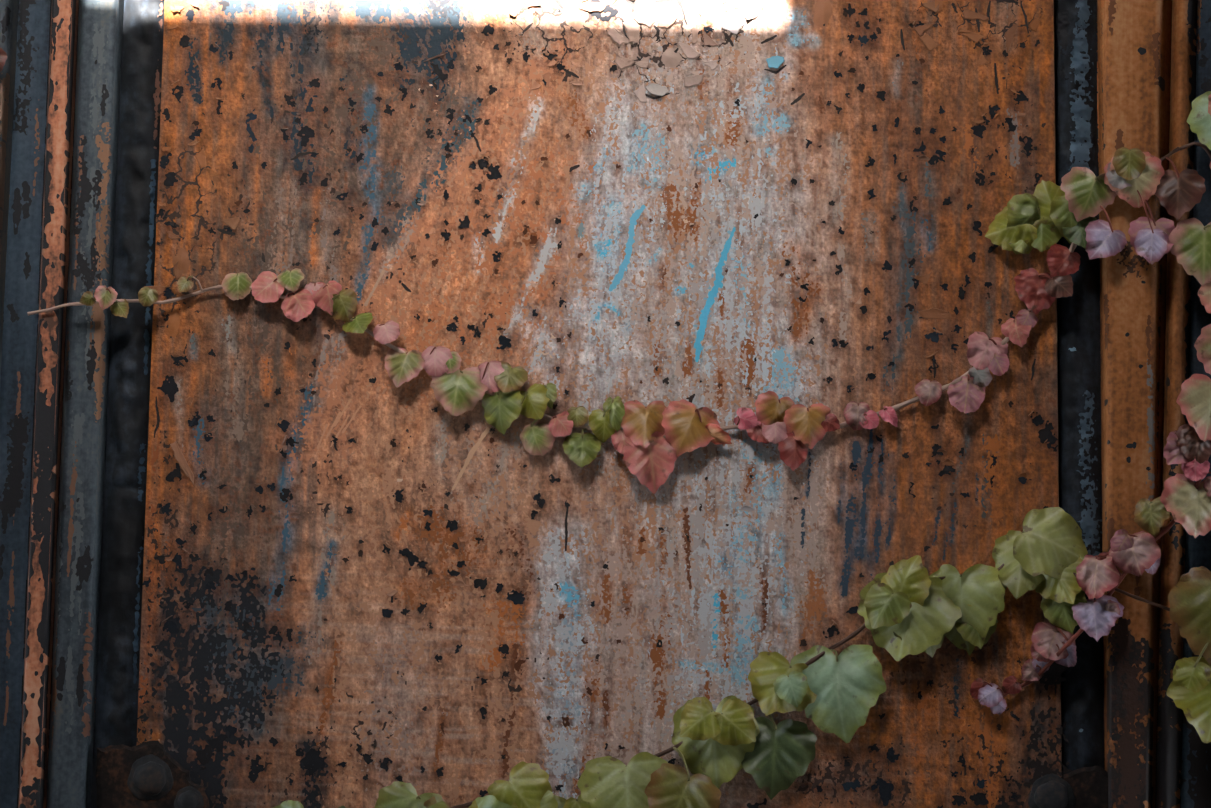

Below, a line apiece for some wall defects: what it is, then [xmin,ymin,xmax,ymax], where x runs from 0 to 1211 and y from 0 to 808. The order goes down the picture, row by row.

peeling [826,1,886,114]
peeling [982,40,1040,57]
corrosion [649,178,706,250]
corrosion [73,122,111,422]
peeling [375,0,846,799]
corrosion [715,339,755,410]
peeling [823,373,876,393]
peeling [855,287,870,314]
peeling [866,316,892,351]
corrosion [625,507,692,589]
corrosion [394,478,560,781]
corrosion [562,654,611,793]